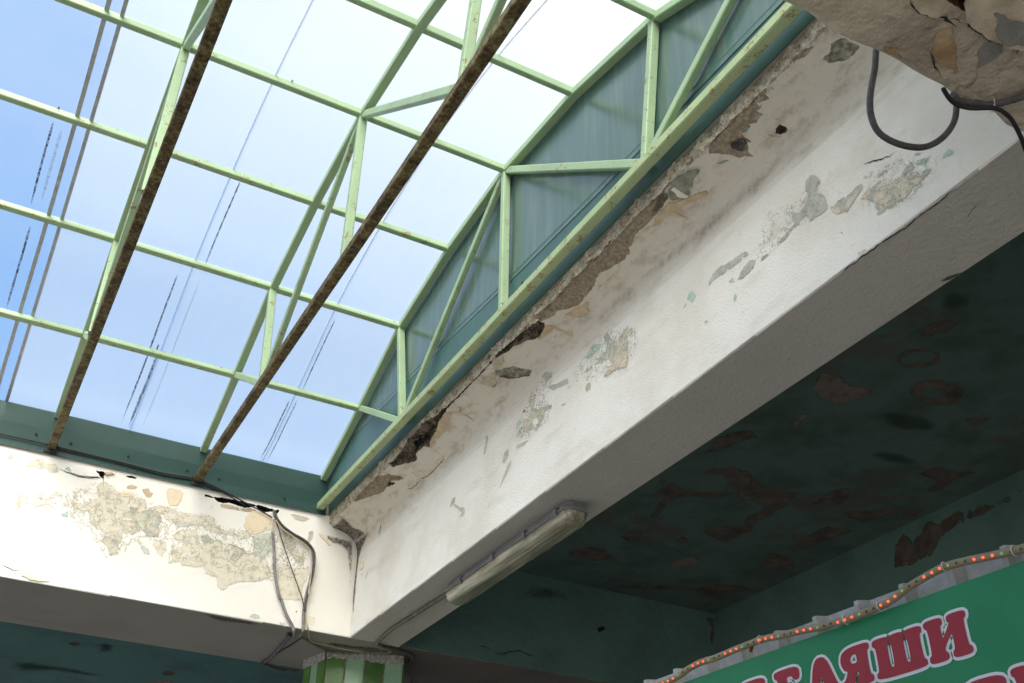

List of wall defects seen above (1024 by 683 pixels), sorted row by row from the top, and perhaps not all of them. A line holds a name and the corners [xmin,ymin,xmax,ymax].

spalling [823,38,860,63]
peeling [910,0,1024,68]
peeling [708,153,931,302]
spalling [480,169,708,488]
spalling [354,408,452,502]
peeling [14,470,331,612]
peeling [894,505,992,567]